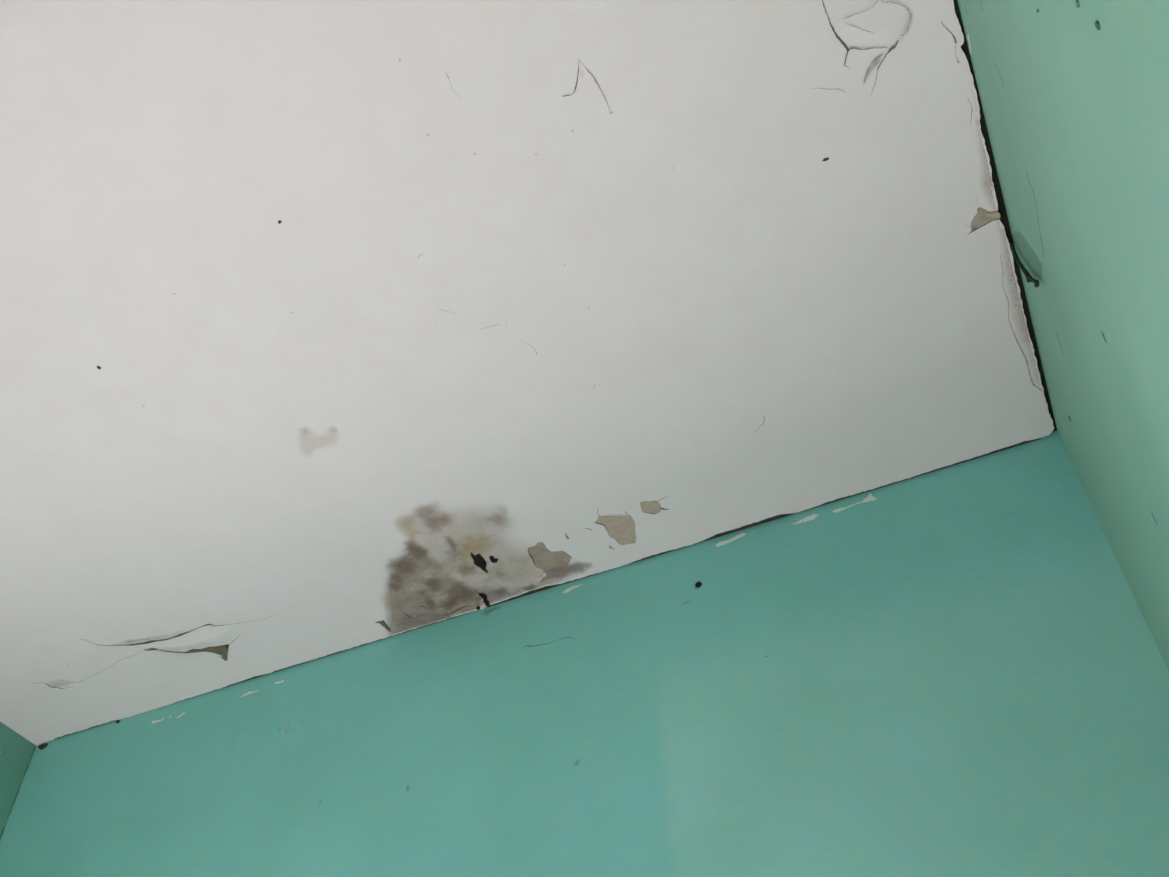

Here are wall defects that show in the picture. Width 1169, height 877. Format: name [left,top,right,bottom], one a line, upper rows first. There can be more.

crack [180,0,1057,701]
leakage [390,540,525,635]
peeling [528,542,571,583]
peeling [594,497,668,545]